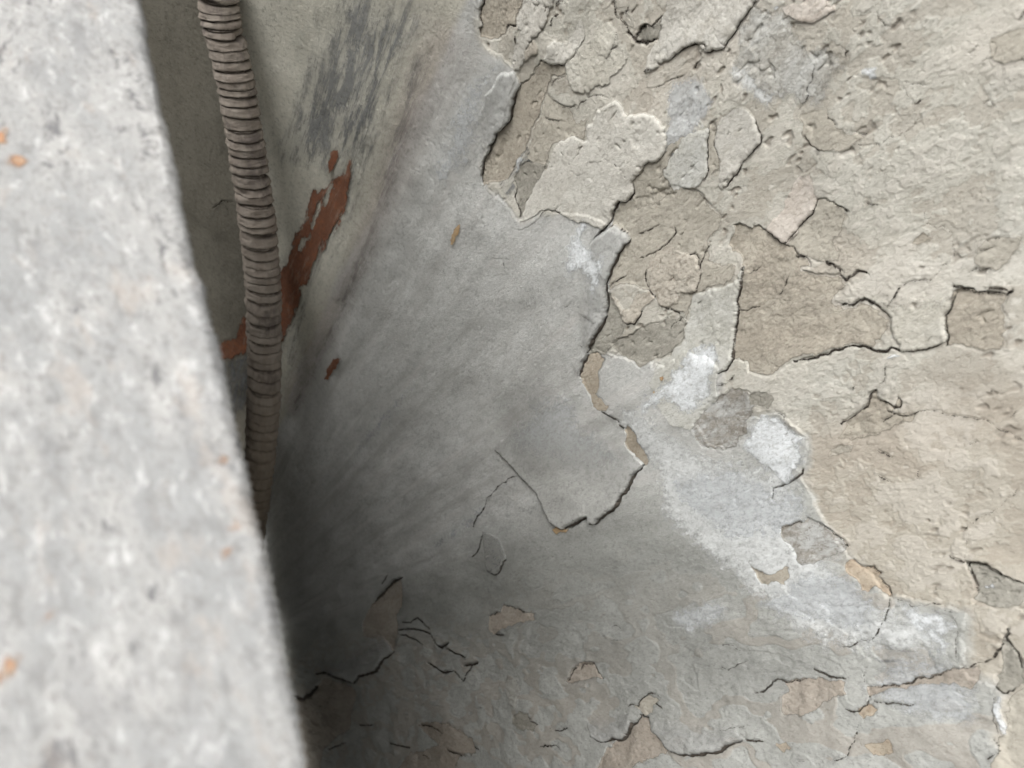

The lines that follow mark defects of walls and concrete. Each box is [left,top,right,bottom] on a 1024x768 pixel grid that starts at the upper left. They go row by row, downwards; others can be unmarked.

leakage [296,0,417,163]
corrosion [219,316,247,359]
corrosion [280,150,352,342]
corrosion [324,358,341,380]
crack [575,161,710,375]
spalling [479,0,1007,457]
crack [718,199,1019,445]
peeling [496,450,631,530]
crack [562,464,645,530]
spalling [751,518,892,596]
spalling [295,678,356,768]
crack [757,566,1022,761]